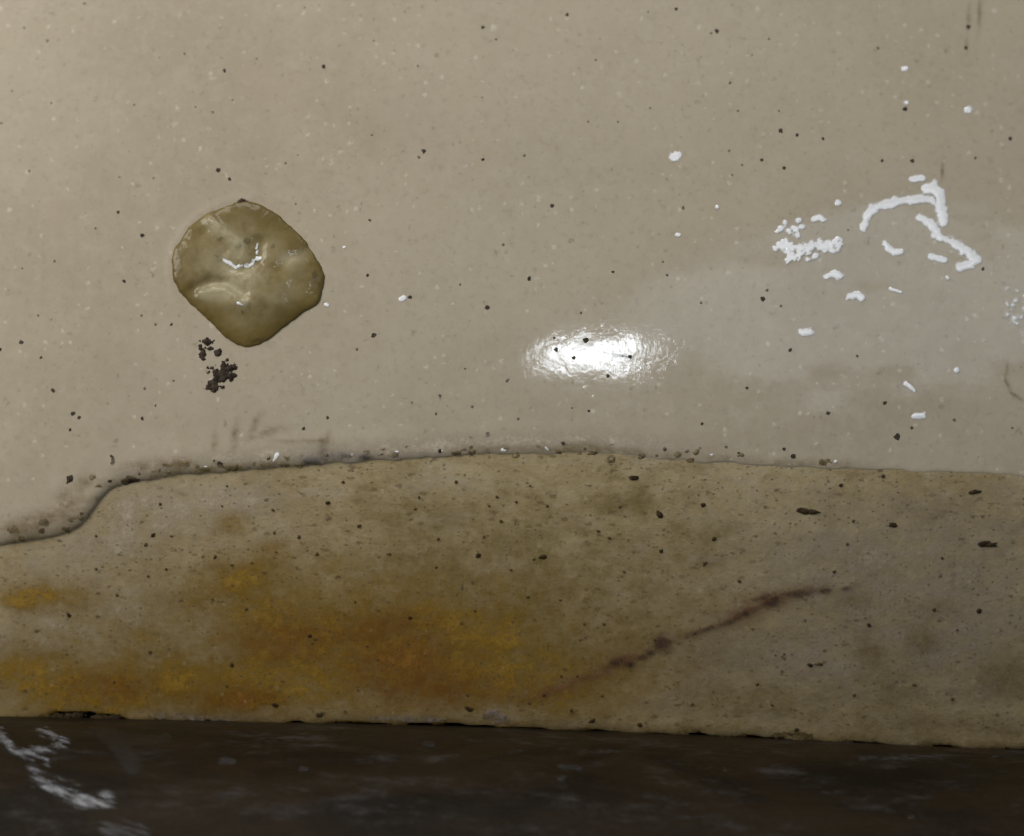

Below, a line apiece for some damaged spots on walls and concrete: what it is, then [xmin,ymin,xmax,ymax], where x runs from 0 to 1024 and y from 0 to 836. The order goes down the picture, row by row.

spalling [796,507,821,515]
spalling [977,540,998,548]
peeling [151,712,254,721]